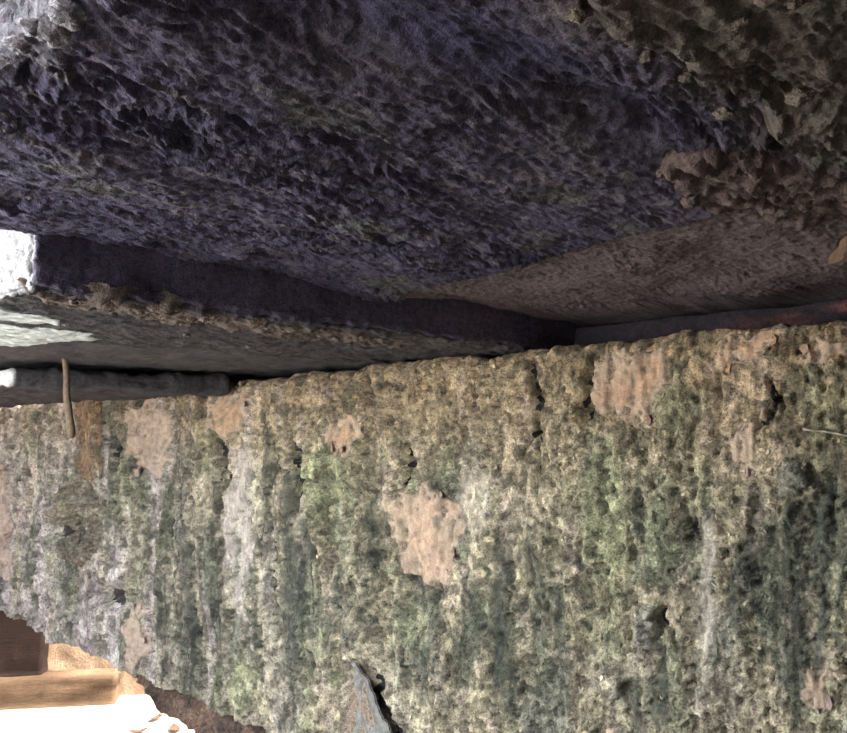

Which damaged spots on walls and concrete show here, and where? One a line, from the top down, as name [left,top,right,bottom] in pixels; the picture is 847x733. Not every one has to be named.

peeling [590,343,669,430]
leakage [223,438,313,659]
peeling [381,482,467,593]
leakage [463,473,489,534]
leakage [816,487,847,665]
leakage [702,605,715,660]
peeling [351,662,403,733]